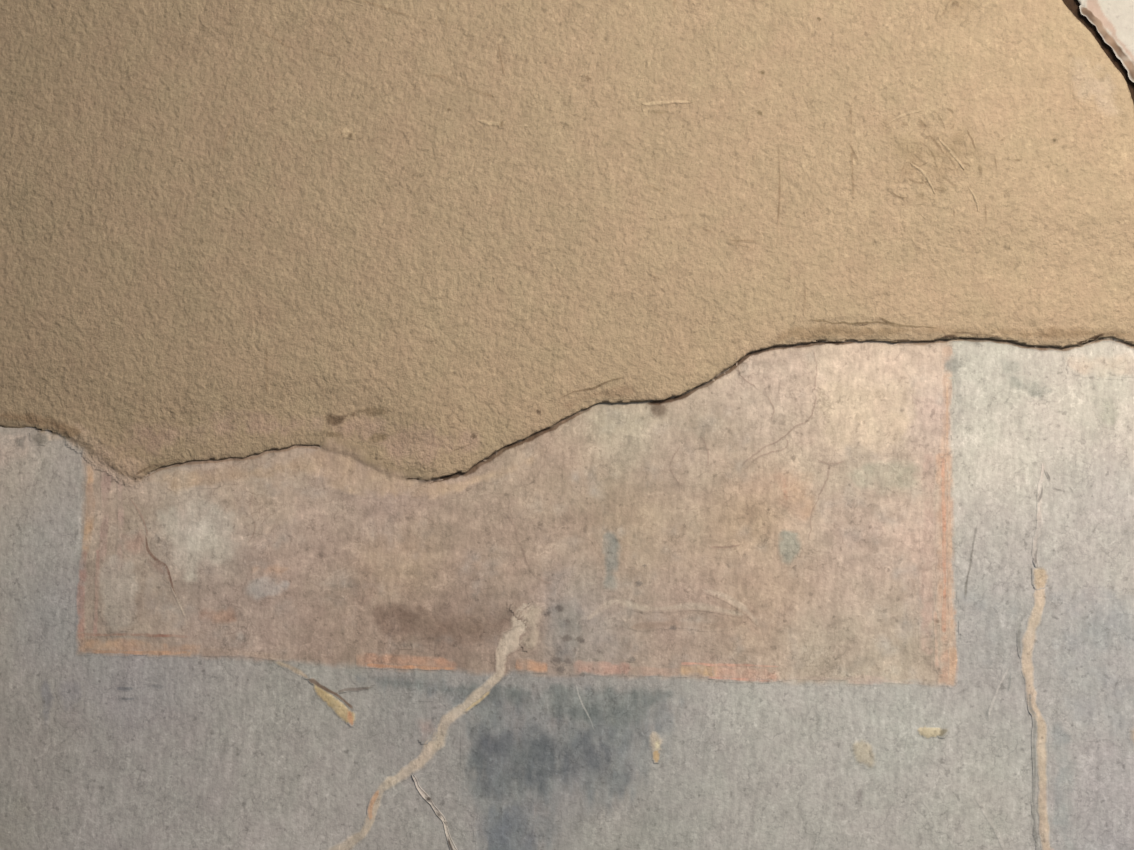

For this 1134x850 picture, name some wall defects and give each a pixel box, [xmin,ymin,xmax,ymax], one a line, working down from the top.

spalling [1079,5,1134,82]
peeling [1076,332,1106,346]
spalling [322,406,390,439]
spalling [649,404,669,419]
peeling [154,496,243,585]
peeling [97,552,143,633]
peeling [585,588,759,626]
spalling [274,660,373,727]
crack [326,513,554,850]
damp [350,593,687,850]
spalling [647,730,664,763]
crack [1016,461,1074,850]